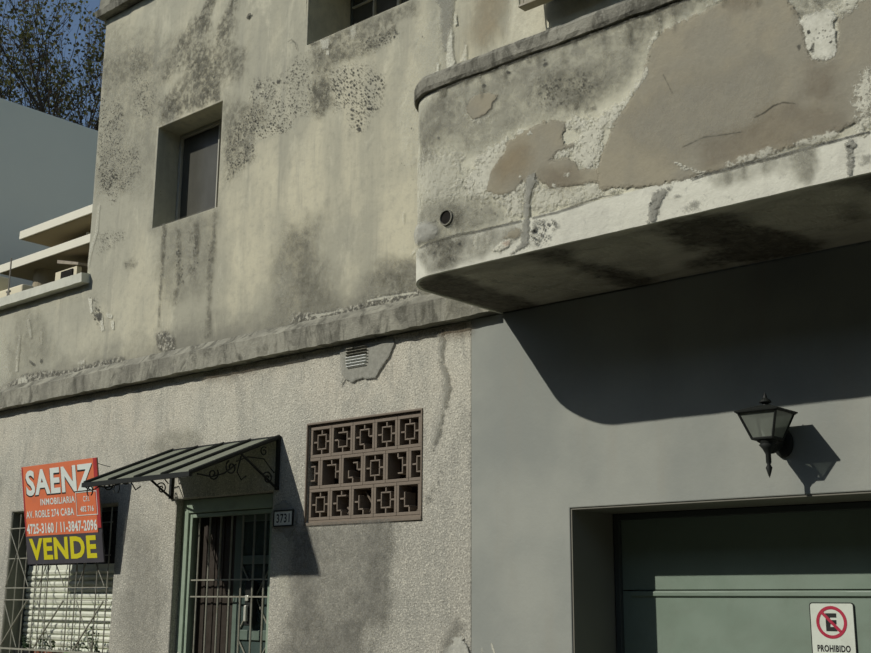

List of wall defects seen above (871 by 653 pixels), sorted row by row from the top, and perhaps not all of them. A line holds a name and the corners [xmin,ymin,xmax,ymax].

damp [164,0,244,117]
peeling [417,0,871,269]
damp [660,215,822,262]
damp [528,250,652,287]
flaking render [292,290,420,322]
flaking render [3,357,122,388]